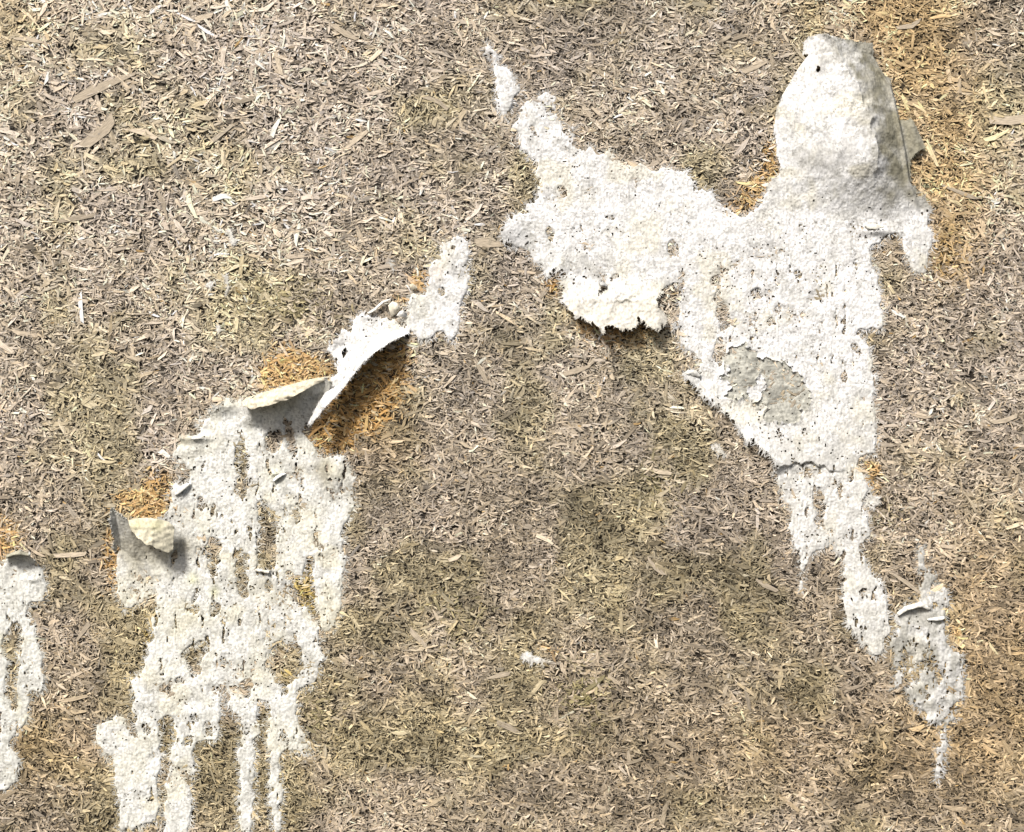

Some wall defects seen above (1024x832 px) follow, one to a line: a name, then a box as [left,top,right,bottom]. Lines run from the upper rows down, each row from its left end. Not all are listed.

peeling [204,272,230,297]
peeling [863,494,882,511]